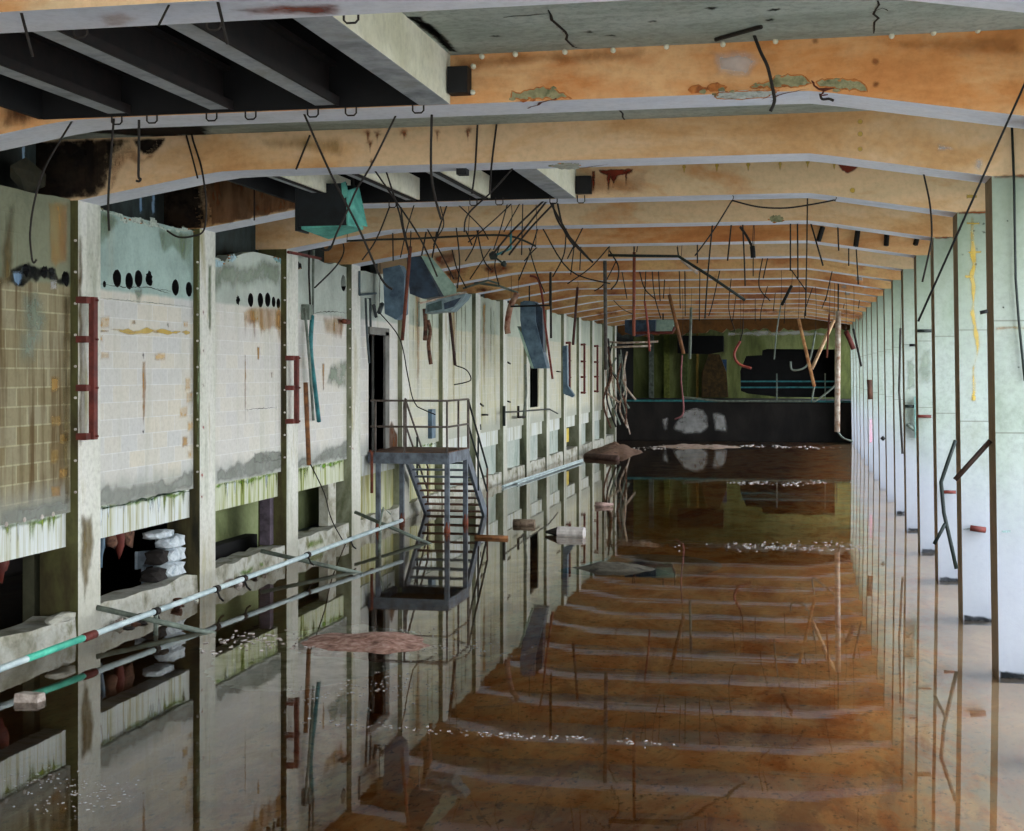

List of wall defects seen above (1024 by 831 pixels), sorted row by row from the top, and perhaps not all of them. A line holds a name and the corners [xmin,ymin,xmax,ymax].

crack [503,10,577,48]
crack [872,0,888,34]
spalling [509,85,572,102]
spalling [712,73,868,102]
spalling [0,144,36,193]
leakage [22,126,210,262]
spalling [100,193,195,233]
rust [592,169,632,189]
spalling [215,225,258,267]
spalling [298,247,324,270]
leakage [218,452,281,494]
leakage [82,471,193,584]